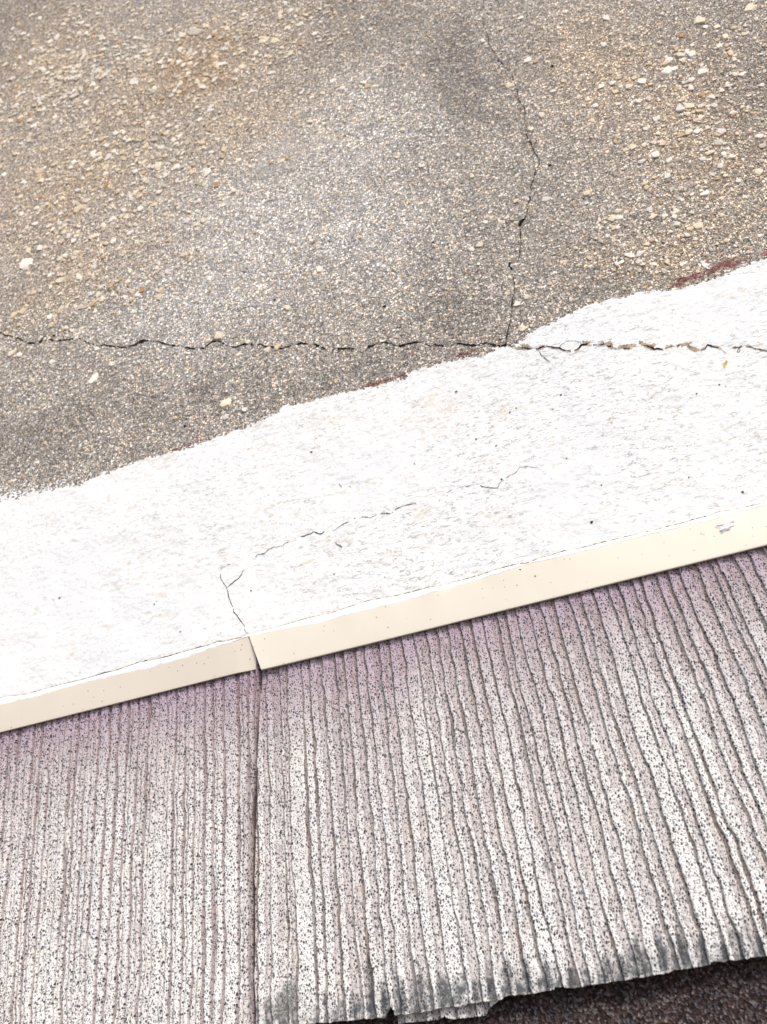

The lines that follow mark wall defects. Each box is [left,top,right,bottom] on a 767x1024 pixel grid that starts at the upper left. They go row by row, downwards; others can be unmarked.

crack [0,2,767,361]
crack [14,466,767,696]